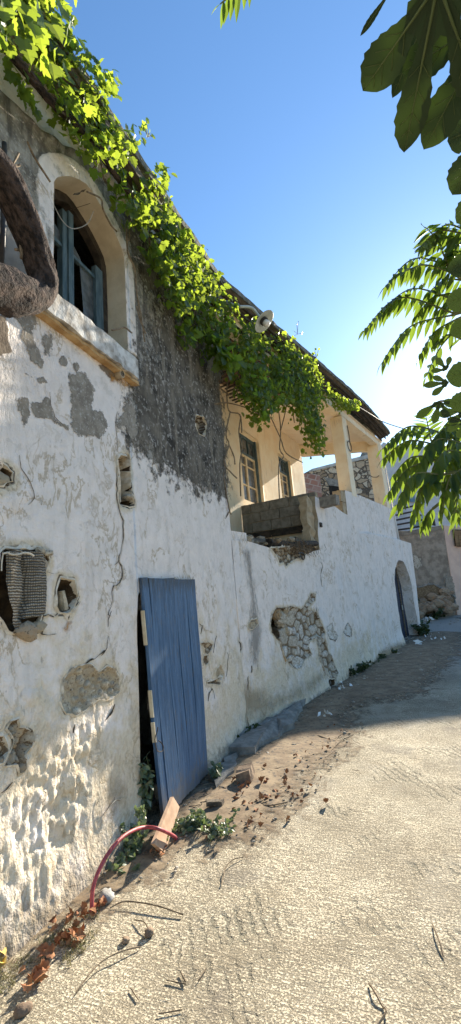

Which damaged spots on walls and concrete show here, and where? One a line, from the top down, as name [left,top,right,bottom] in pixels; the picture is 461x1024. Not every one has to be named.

peeling [0,315,140,440]
spalling [0,460,14,487]
spalling [117,453,136,508]
spalling [0,542,79,642]
crack [102,467,125,655]
spalling [247,592,352,689]
spalling [58,663,120,718]
spalling [0,716,35,776]